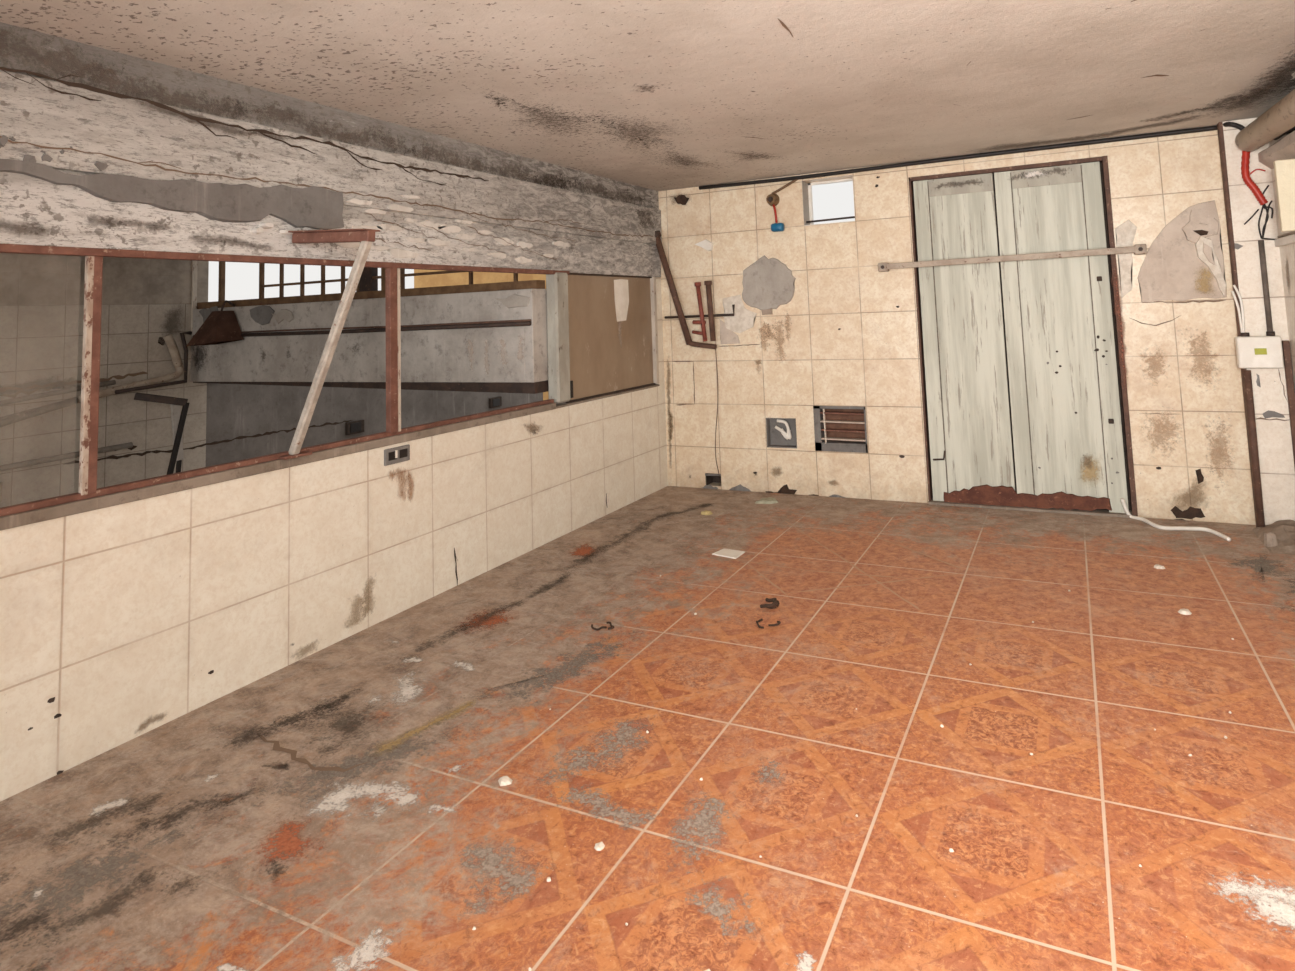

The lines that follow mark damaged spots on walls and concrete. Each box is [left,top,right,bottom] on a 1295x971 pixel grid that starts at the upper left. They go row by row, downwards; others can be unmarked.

spalling [0,135,575,264]
water stain [0,27,643,204]
crack [0,67,653,237]
water stain [492,95,714,167]
water stain [989,57,1295,150]